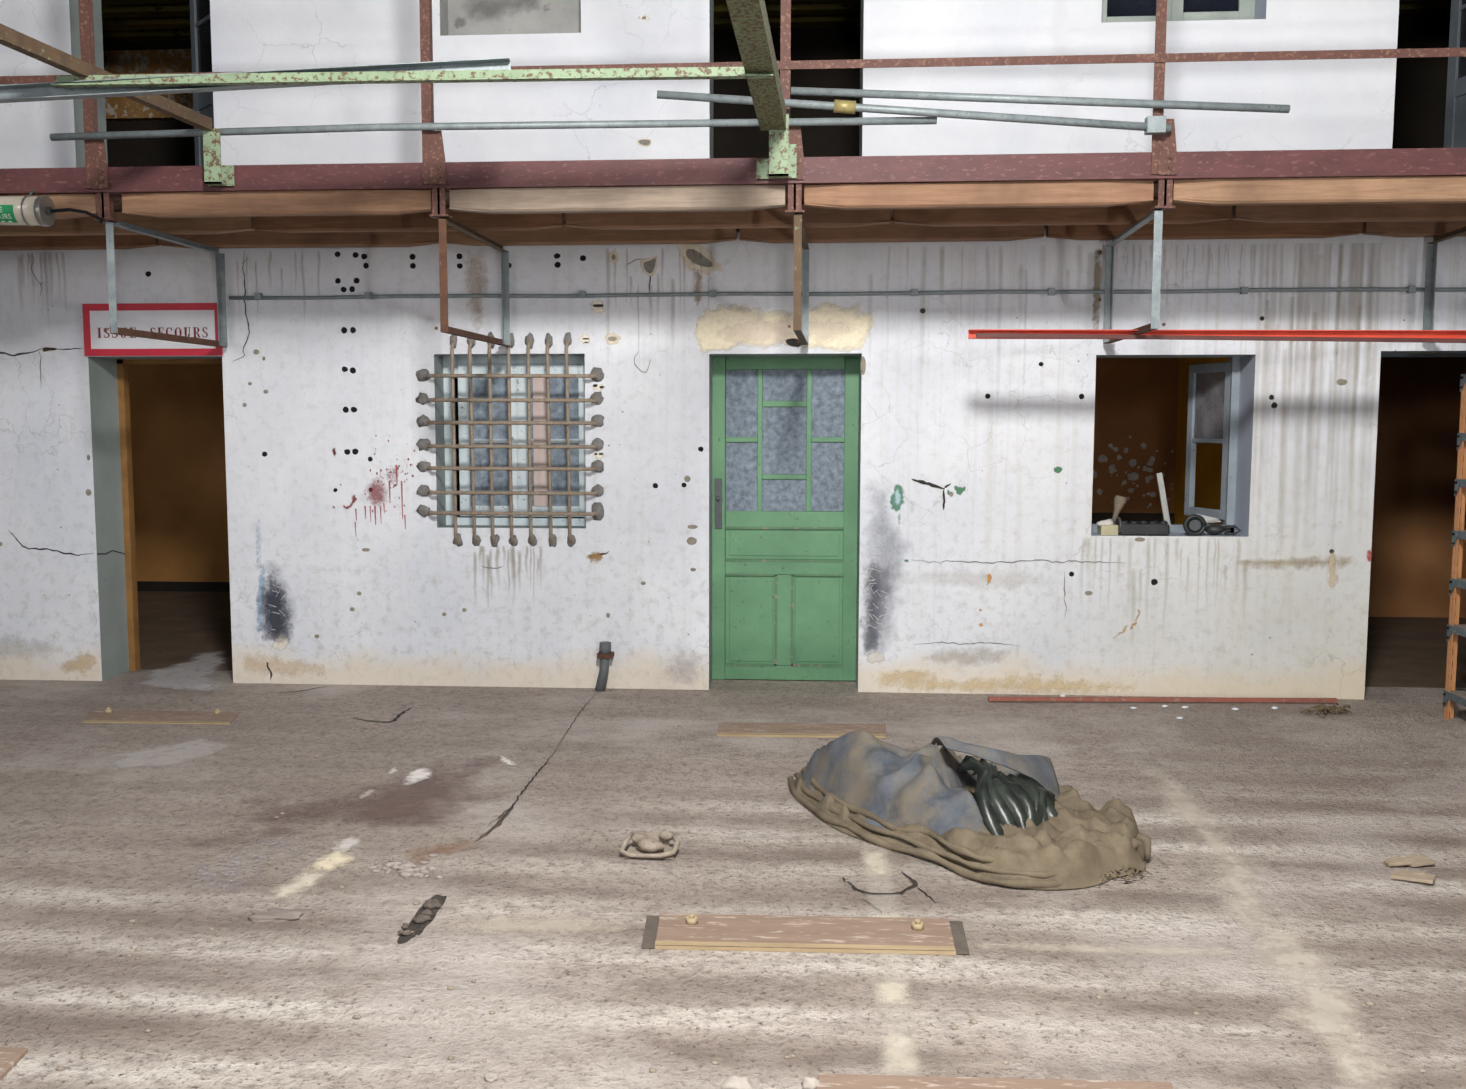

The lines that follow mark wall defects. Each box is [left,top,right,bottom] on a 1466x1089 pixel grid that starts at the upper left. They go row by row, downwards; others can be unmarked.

crack [8,530,125,556]
crack [476,697,593,841]